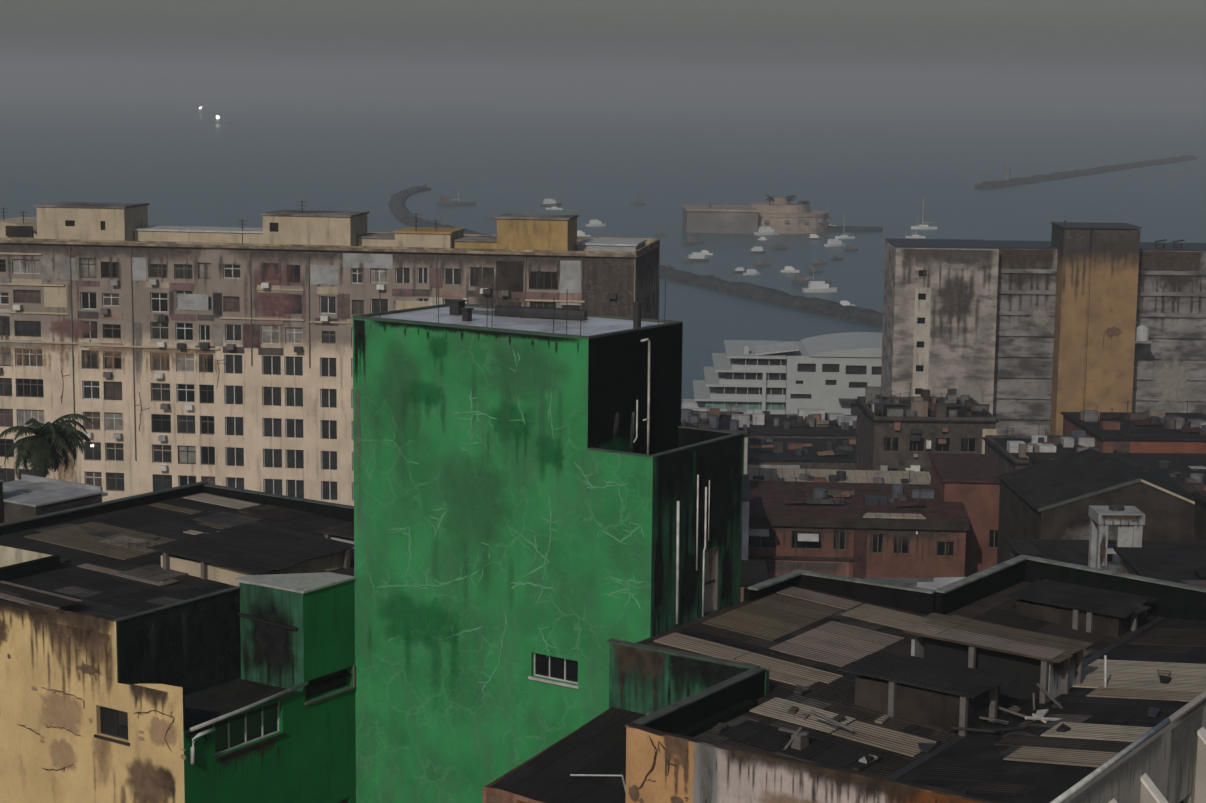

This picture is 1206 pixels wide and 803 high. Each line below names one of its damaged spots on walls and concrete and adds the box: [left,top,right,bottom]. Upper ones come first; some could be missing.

leakage [903,230,1204,337]
leakage [0,589,294,711]
crack [376,494,559,695]
crack [448,350,649,610]
leakage [654,435,959,636]
leakage [121,760,175,803]
leakage [664,735,991,803]